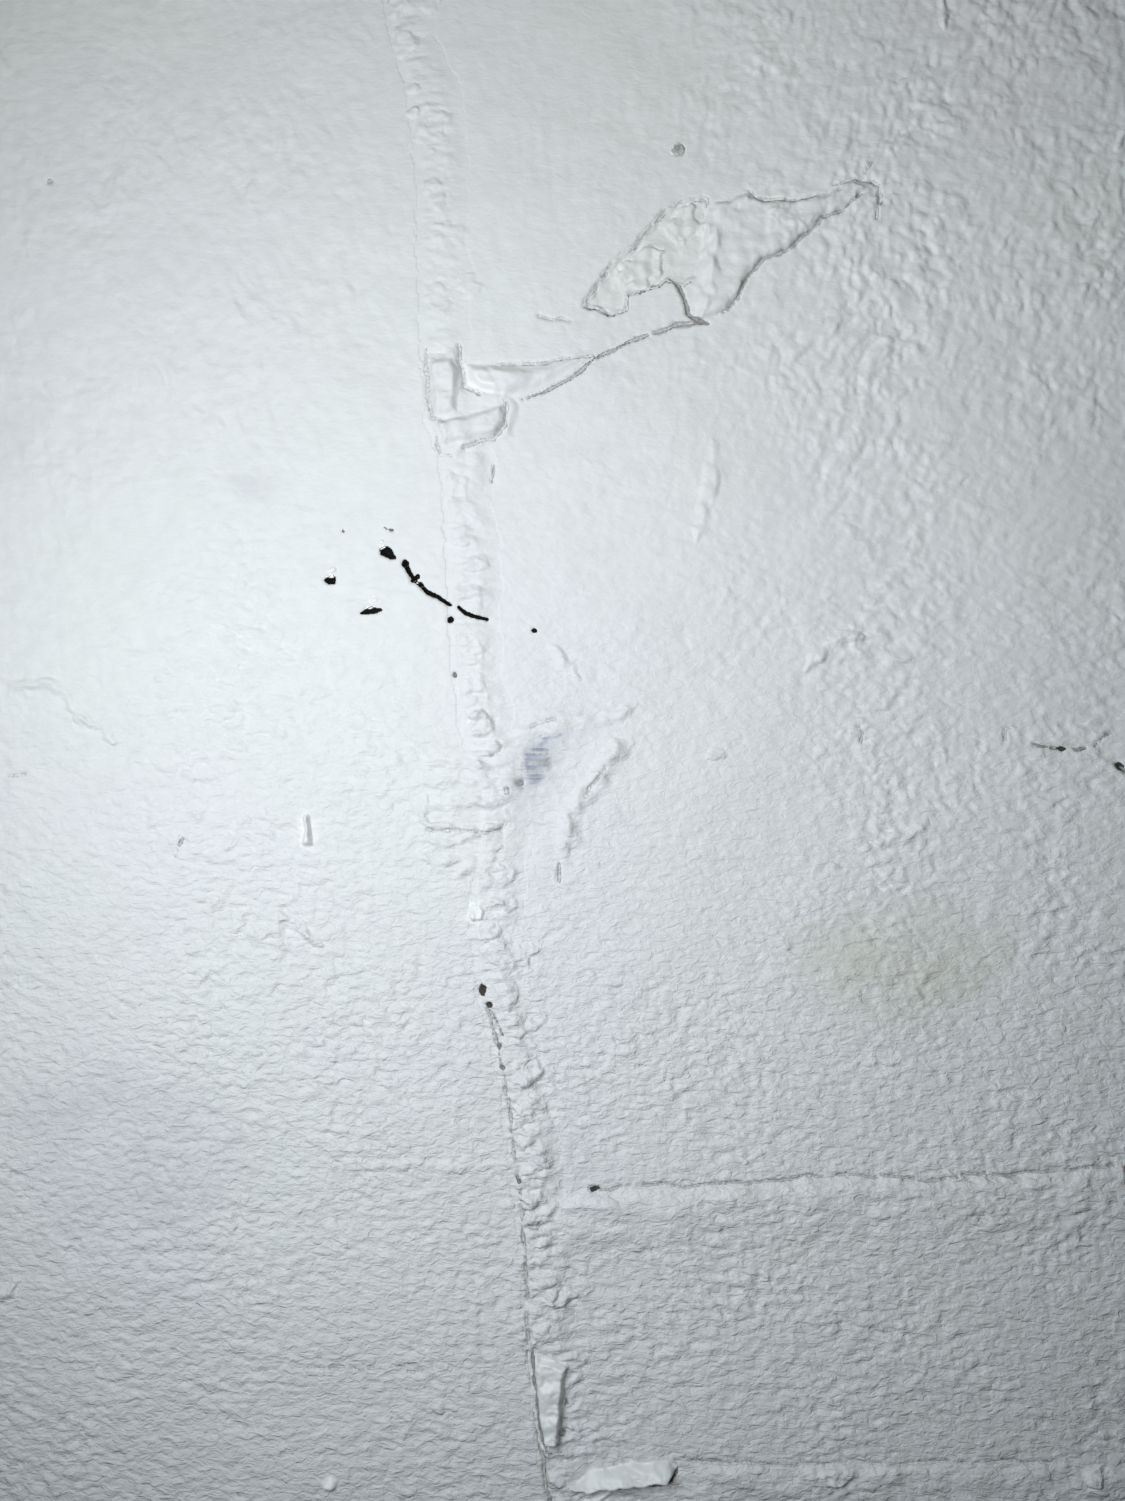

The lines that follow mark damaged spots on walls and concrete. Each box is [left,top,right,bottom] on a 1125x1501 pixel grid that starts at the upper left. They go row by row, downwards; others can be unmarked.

crack [331,0,1125,1501]
peeling [582,95,1026,325]